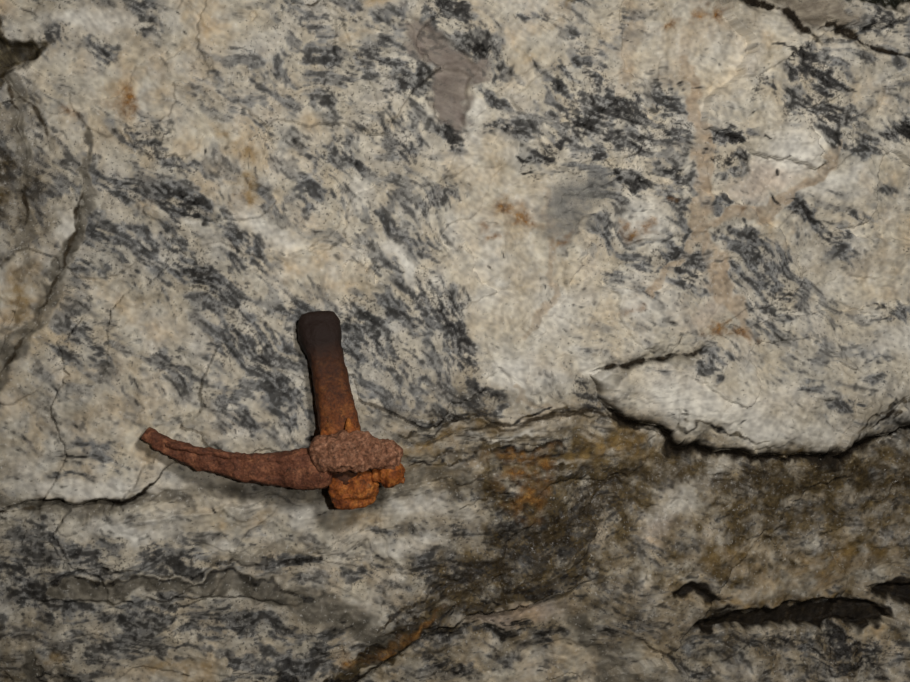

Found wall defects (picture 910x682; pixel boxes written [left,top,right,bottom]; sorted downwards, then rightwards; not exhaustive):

spalling [776,0,859,30]
spalling [407,21,487,131]
crack [8,82,48,134]
crack [21,187,29,217]
crack [43,196,83,307]
crack [6,339,22,364]
crack [597,348,703,370]
crack [429,407,910,469]
crack [0,472,162,512]
crack [354,606,528,682]